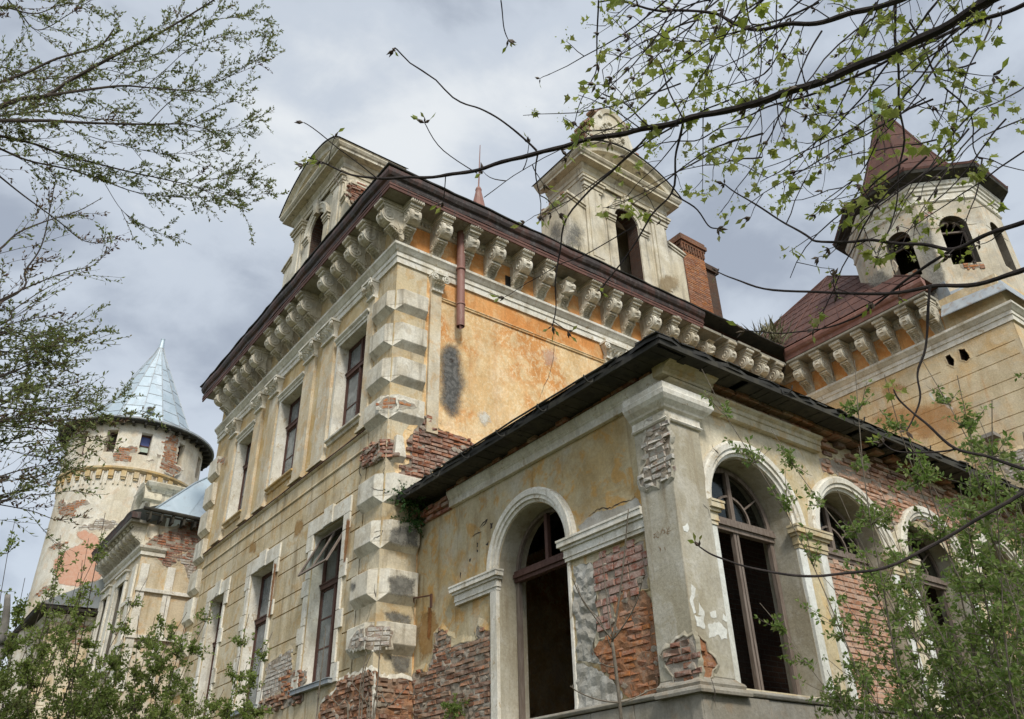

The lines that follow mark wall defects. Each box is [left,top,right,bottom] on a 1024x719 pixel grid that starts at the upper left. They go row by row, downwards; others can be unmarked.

leakage [441,346,463,416]
spalling [57,496,119,533]
spalling [111,432,184,477]
spalling [142,520,202,583]
spalling [359,395,477,479]
spalling [578,411,676,531]
spalling [815,452,1024,561]
spalling [317,618,491,719]
spalling [572,537,728,709]
flaking render [827,557,903,705]